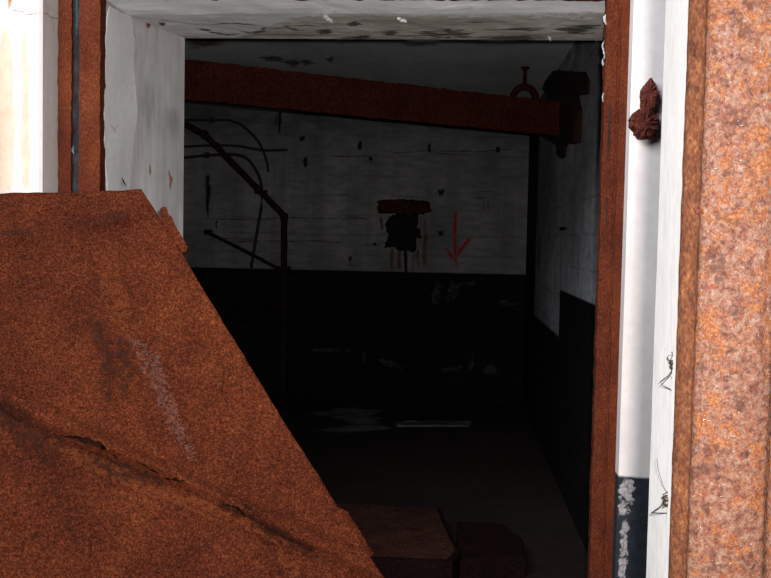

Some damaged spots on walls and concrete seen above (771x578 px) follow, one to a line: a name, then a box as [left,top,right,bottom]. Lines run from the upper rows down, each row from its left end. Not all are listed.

rust [0,22,31,193]
rust [46,437,300,578]
peeling [618,478,636,578]